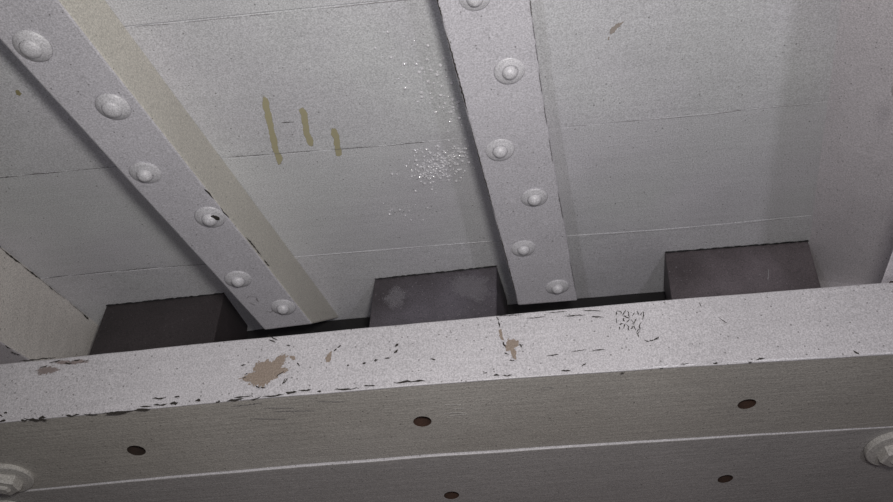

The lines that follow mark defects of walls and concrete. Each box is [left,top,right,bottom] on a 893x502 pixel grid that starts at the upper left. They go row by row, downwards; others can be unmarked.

peeling [496,317,522,361]
peeling [216,345,321,403]
spalling [66,396,179,417]